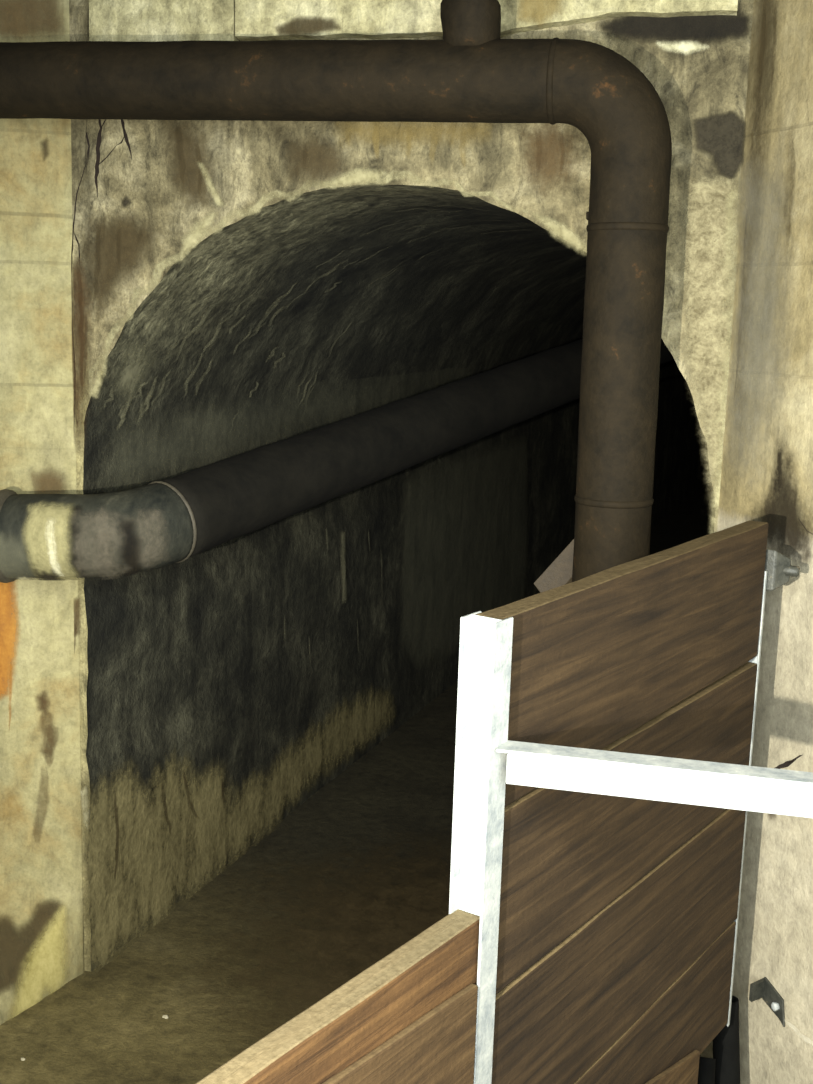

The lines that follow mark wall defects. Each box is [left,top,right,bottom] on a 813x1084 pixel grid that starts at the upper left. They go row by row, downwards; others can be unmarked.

water stain [278,18,338,35]
crack [71,119,132,275]
crack [70,302,78,416]
crack [775,755,802,769]